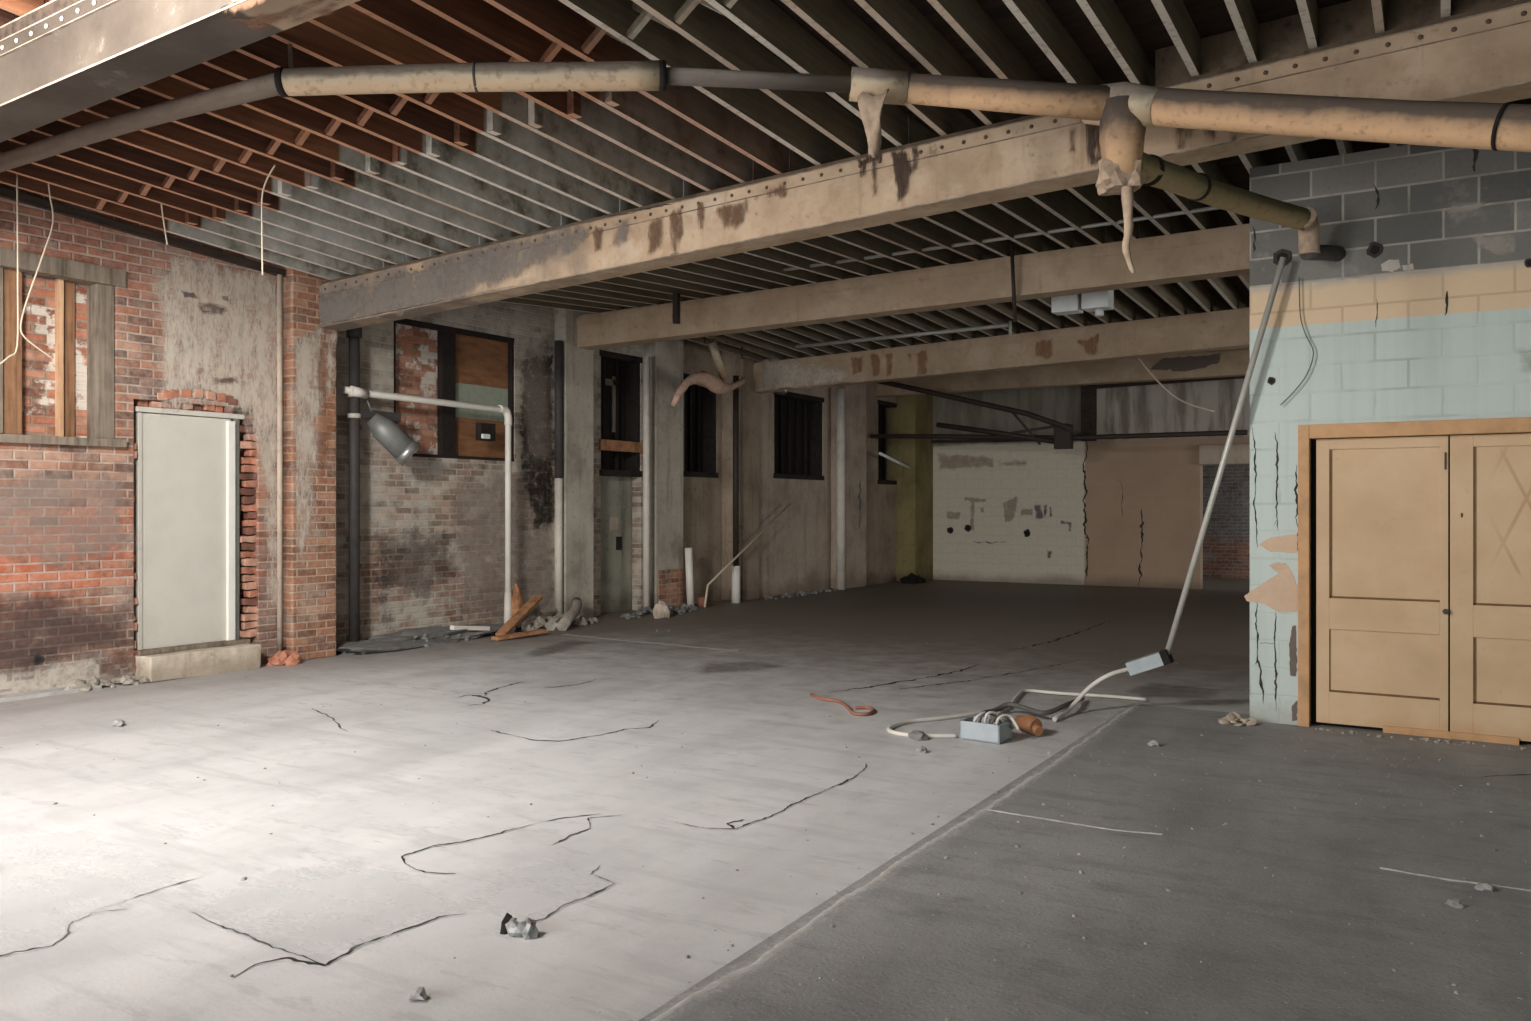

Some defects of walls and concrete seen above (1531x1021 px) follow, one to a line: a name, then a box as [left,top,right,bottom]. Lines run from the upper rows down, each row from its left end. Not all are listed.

peeling [134,257,337,637]
damp [0,597,135,695]
peeling [1244,534,1297,676]
crack [0,877,465,979]
crack [400,814,618,875]
crack [537,865,614,922]
crack [675,763,867,830]